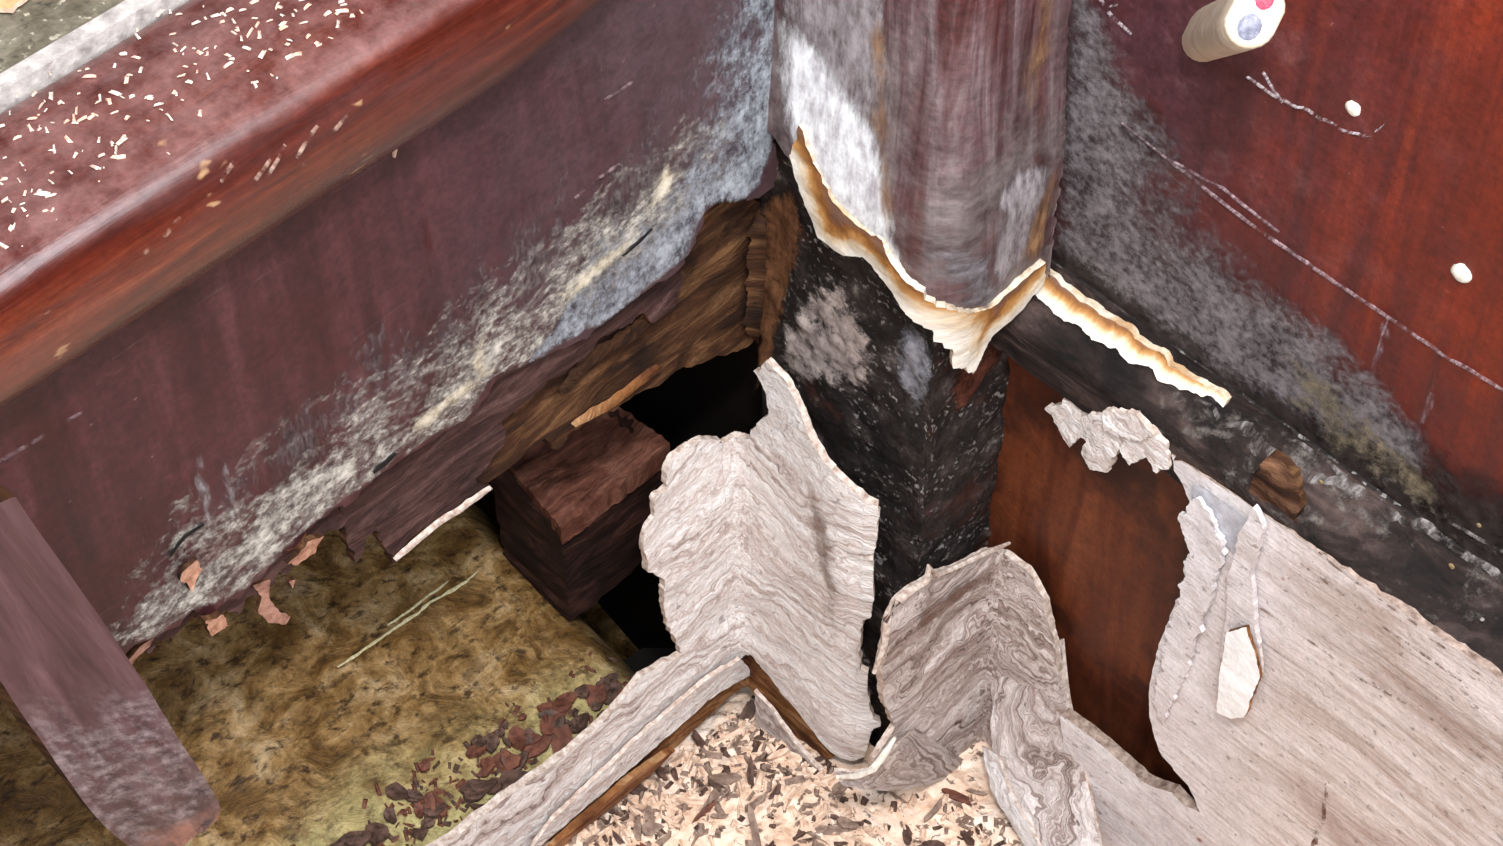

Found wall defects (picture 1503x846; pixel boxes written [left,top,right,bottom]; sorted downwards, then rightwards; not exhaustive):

water stain [116,0,899,640]
water stain [898,329,931,404]
water stain [944,170,1045,306]
water stain [1054,0,1503,576]
peeling [1045,398,1172,473]